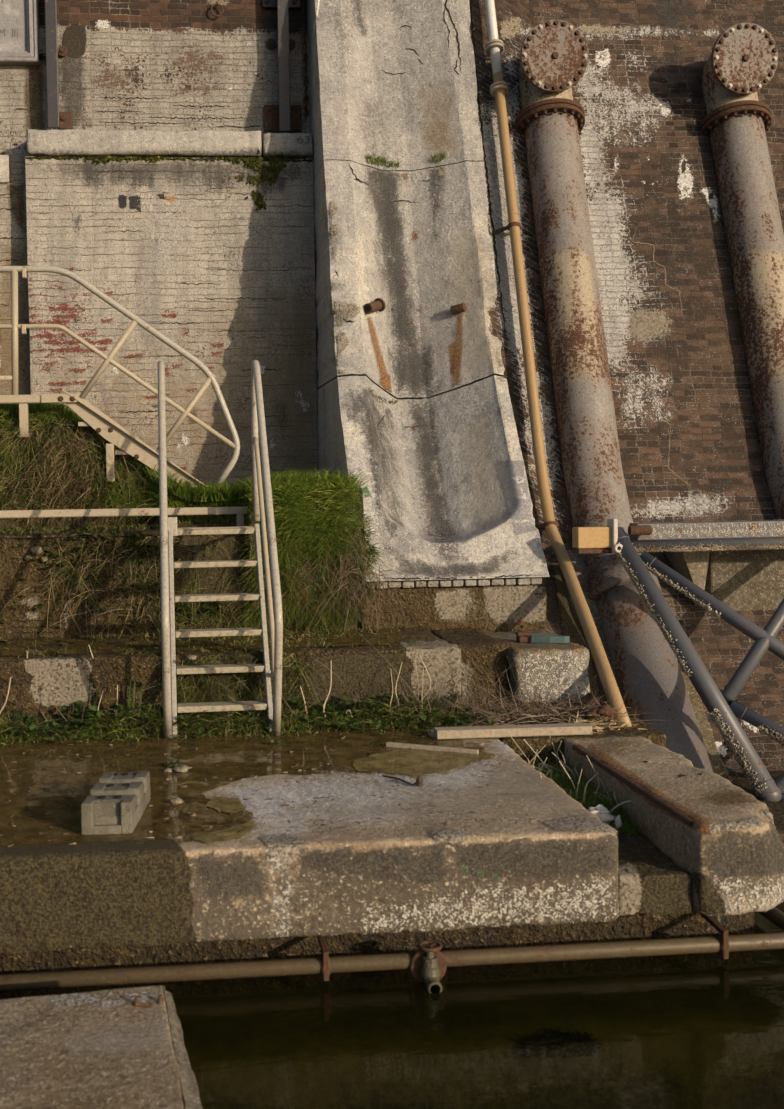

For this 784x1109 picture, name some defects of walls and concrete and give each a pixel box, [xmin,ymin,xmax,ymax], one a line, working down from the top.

crack [382,25,425,75]
crack [443,0,462,75]
leakage [595,49,611,70]
leakage [583,82,671,171]
leakage [677,154,720,221]
peeling [29,267,113,393]
corrosion [367,317,392,395]
leakage [345,170,517,577]
corrosion [449,315,463,387]
leakage [627,308,673,343]
leakage [646,495,720,518]
leakage [301,829,447,883]